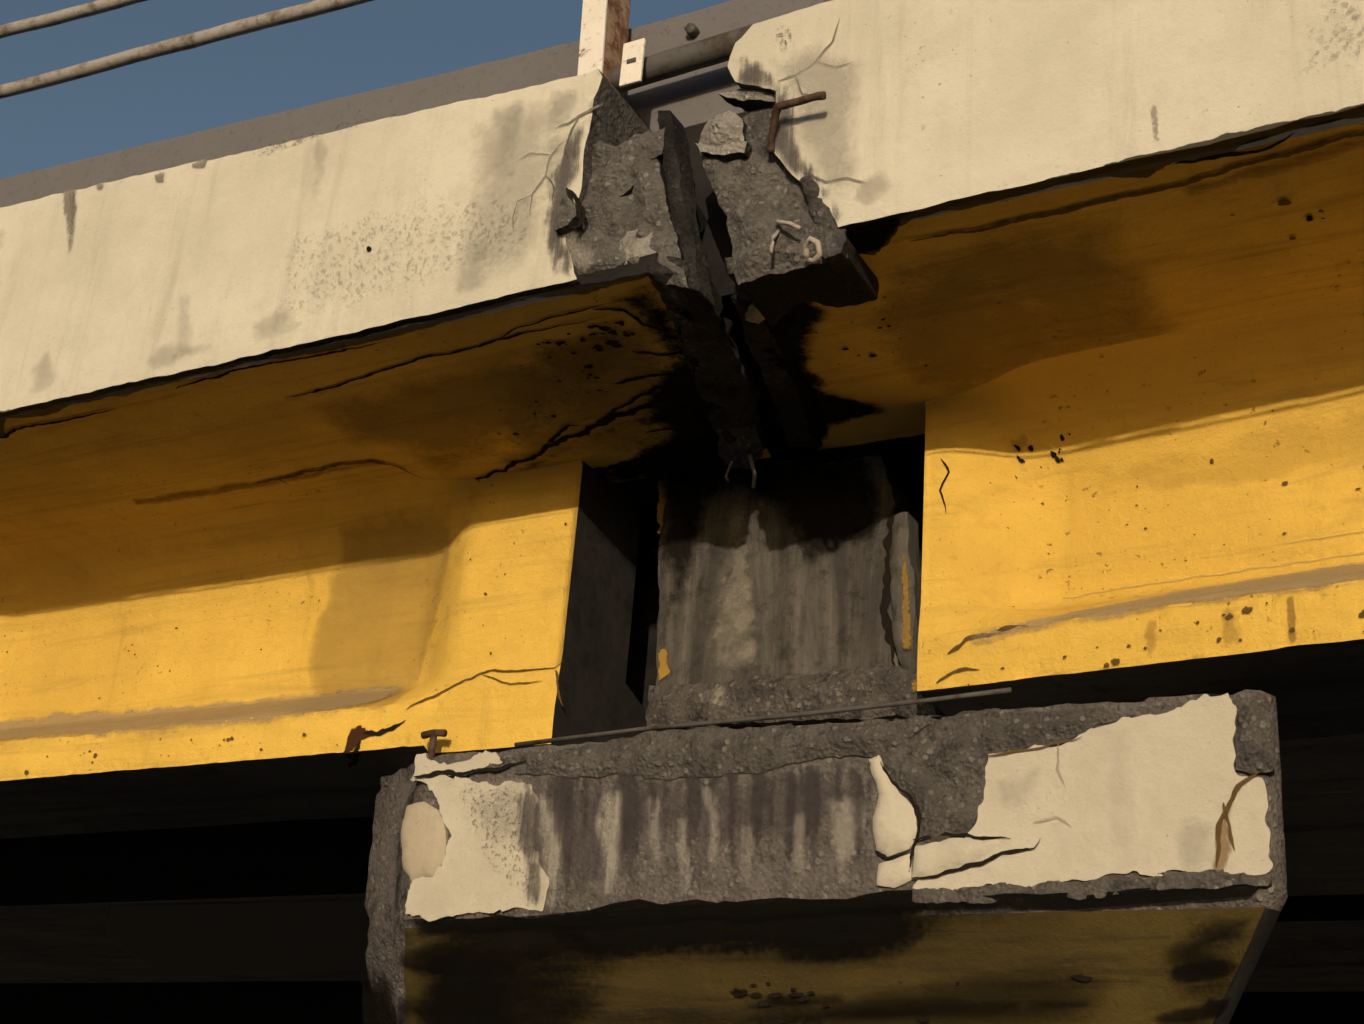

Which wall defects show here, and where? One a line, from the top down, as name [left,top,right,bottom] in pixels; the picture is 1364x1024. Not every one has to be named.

crack [911,131,1364,242]
spalling [0,88,1364,438]
crack [285,303,706,480]
damp [763,315,869,453]
peeling [1014,433,1071,478]
damp [715,515,754,664]
crack [344,663,563,768]
crack [413,760,526,778]
damp [711,687,725,707]
spalling [1229,695,1276,775]
damp [377,767,1260,1024]
spalling [912,869,1273,911]